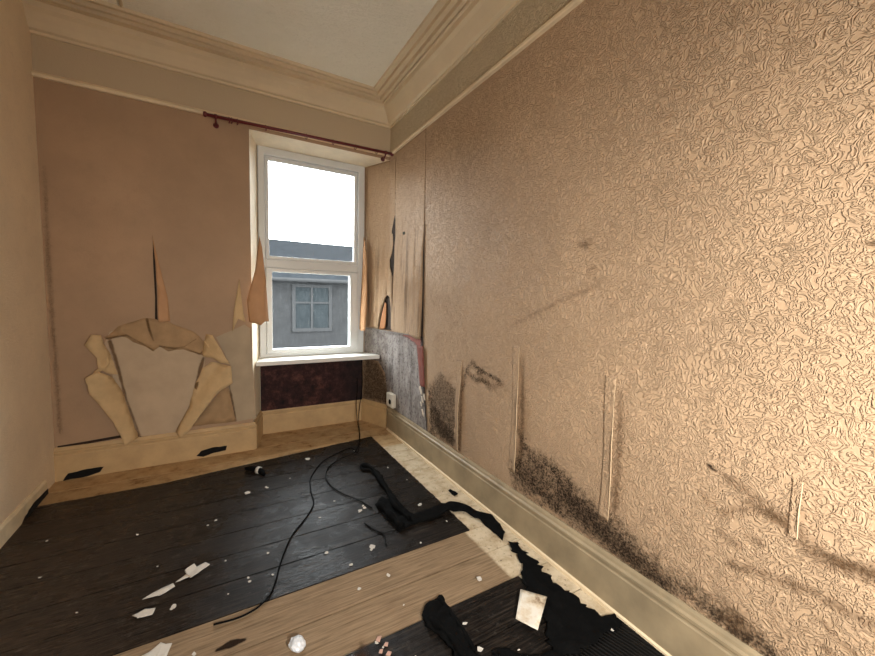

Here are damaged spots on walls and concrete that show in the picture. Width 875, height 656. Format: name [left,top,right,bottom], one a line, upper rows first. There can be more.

flaking render [104,330,205,437]
flaking render [216,280,256,422]
flaking render [364,327,426,430]
leakage [428,374,464,446]
leakage [512,433,775,656]